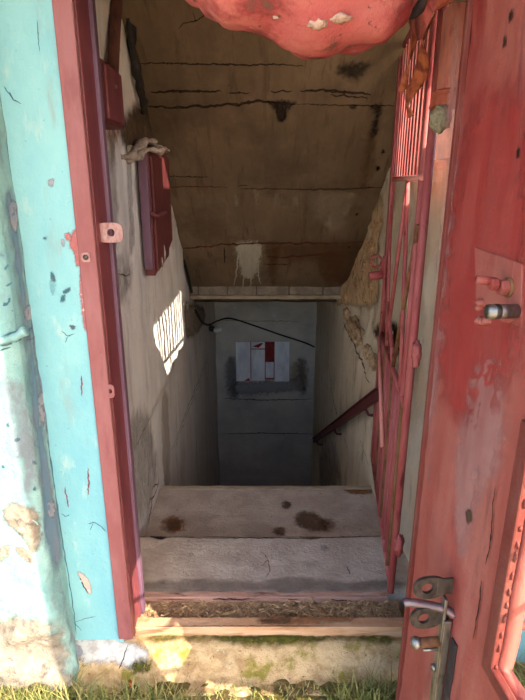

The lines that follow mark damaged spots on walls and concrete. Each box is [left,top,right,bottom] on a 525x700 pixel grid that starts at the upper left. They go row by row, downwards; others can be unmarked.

crack [140,60,303,68]
crack [148,88,393,122]
damp [370,106,381,138]
damp [234,242,261,287]
spalling [336,196,383,307]
crack [343,322,369,382]
peeling [0,192,61,566]
damp [162,517,184,533]
damp [296,511,329,531]